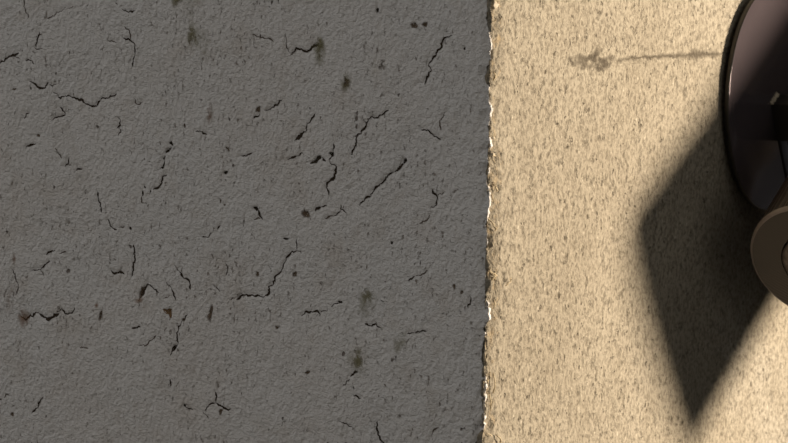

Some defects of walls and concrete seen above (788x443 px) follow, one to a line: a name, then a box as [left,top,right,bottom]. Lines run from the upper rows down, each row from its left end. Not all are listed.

crack [0,0,143,119]
crack [252,33,319,55]
crack [424,35,452,84]
spalling [485,59,496,87]
spalling [487,0,499,32]
crack [627,52,717,60]
crack [287,110,405,219]
crack [23,308,75,321]
crack [111,245,191,355]
crack [214,239,301,300]
spalling [485,215,498,314]
spalling [477,326,502,443]